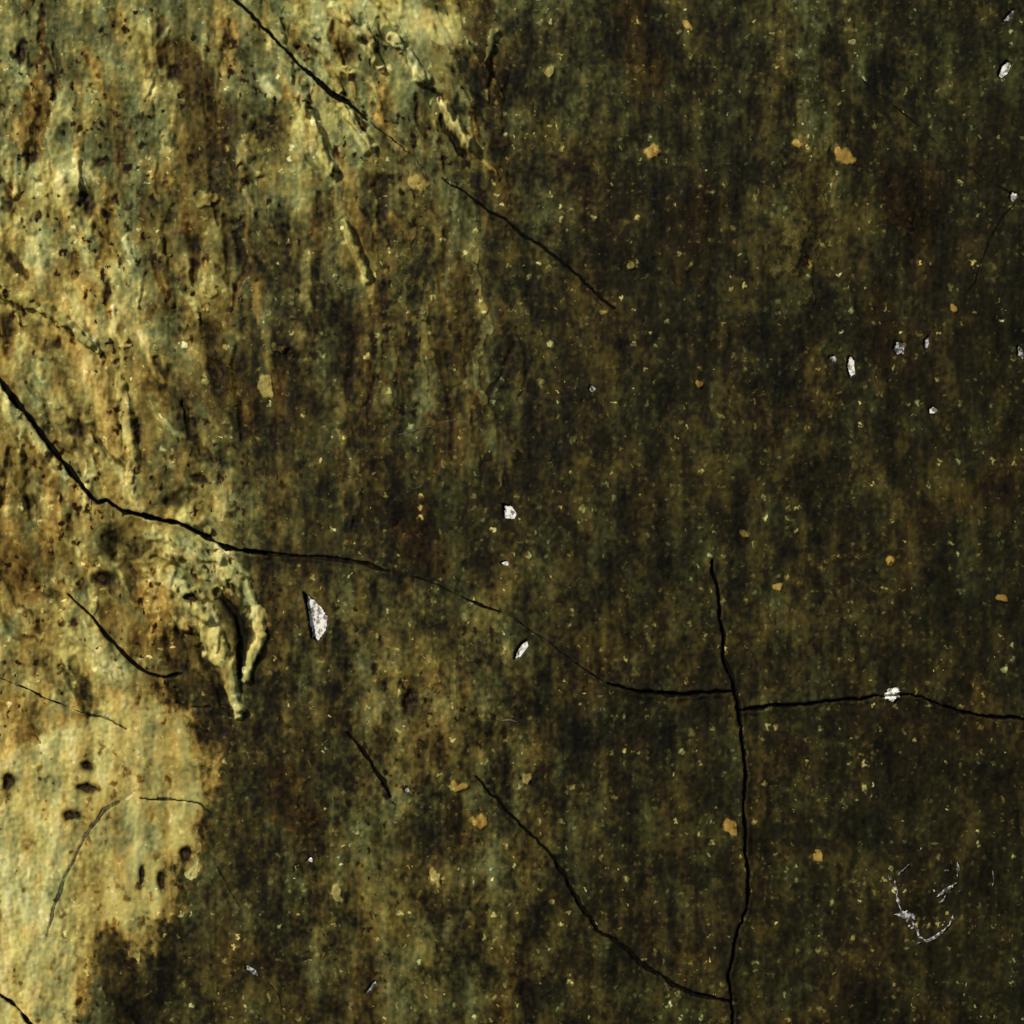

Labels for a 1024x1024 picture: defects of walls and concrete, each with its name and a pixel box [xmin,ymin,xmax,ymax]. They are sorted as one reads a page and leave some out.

crack [234,0,615,309]
damp [471,0,510,239]
damp [663,180,719,285]
damp [775,65,836,309]
damp [866,275,902,380]
peeling [307,595,328,641]
crack [0,378,1024,1024]